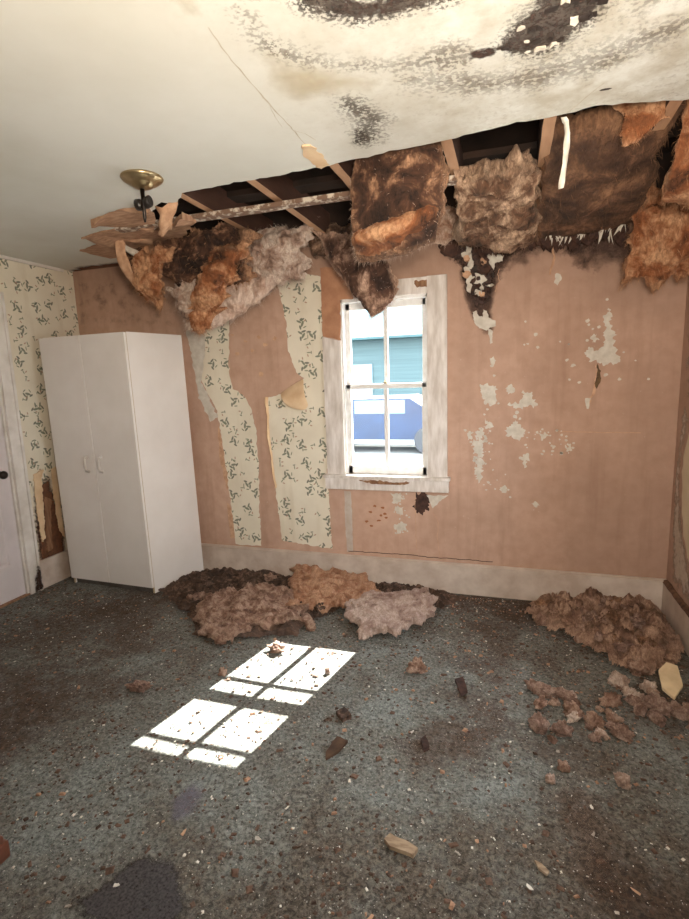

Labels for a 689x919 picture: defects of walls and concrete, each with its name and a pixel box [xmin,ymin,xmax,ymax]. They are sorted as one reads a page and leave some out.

leakage [297,0,456,26]
leakage [449,67,566,91]
leakage [425,0,609,64]
leakage [591,51,621,67]
leakage [642,22,685,41]
mould [340,98,383,145]
flaking render [320,267,353,340]
peeling [438,240,504,344]
peeling [584,298,625,377]
peeling [186,330,229,489]
peeling [464,356,575,498]
flaking render [359,480,448,534]